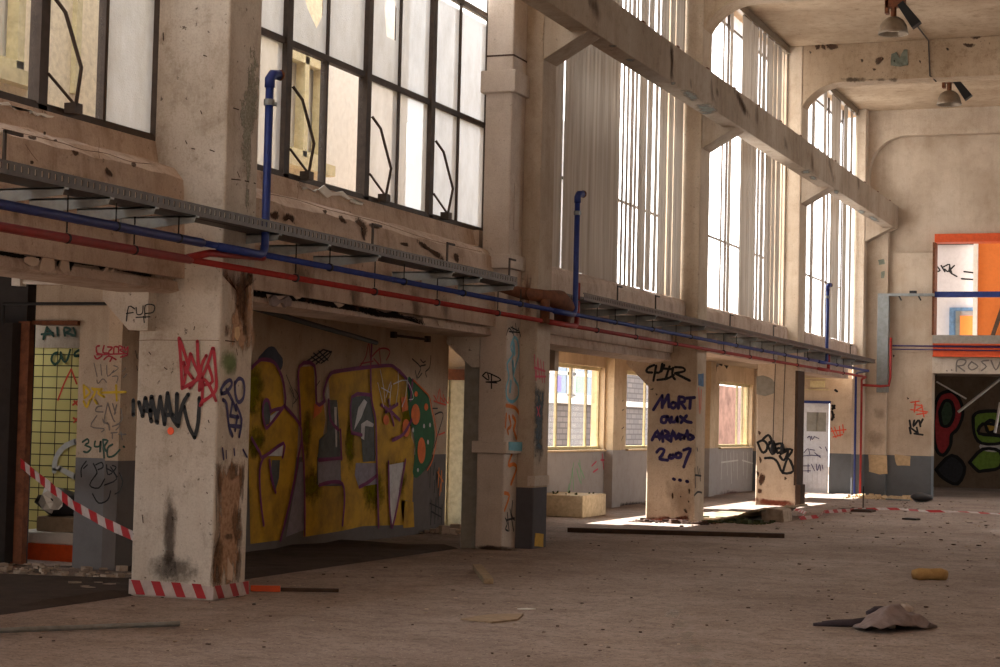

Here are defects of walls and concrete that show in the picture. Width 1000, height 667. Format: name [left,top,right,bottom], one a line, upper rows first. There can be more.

peeling [861,49,921,71]
peeling [298,181,363,205]
flaking render [270,211,295,224]
flaking render [339,216,381,240]
flaking render [400,240,459,263]
flaking render [225,273,446,356]
flaking render [206,460,244,587]
water stain [157,505,190,580]